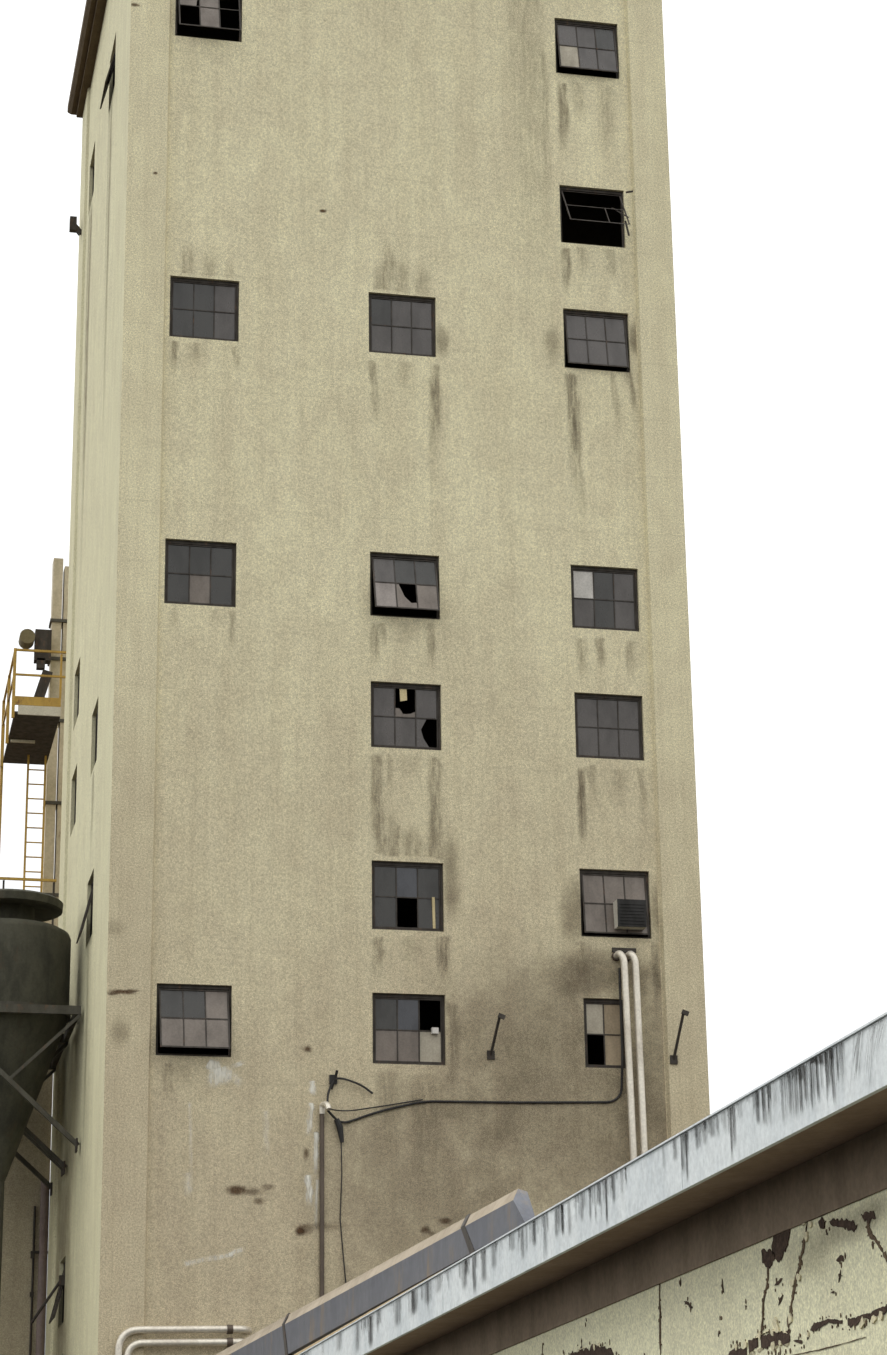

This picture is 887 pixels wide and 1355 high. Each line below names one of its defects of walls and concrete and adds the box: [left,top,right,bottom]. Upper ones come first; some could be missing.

damp [756,1032,871,1120]
crack [865,1222,887,1262]
crack [656,1284,664,1355]
crack [761,1221,865,1355]